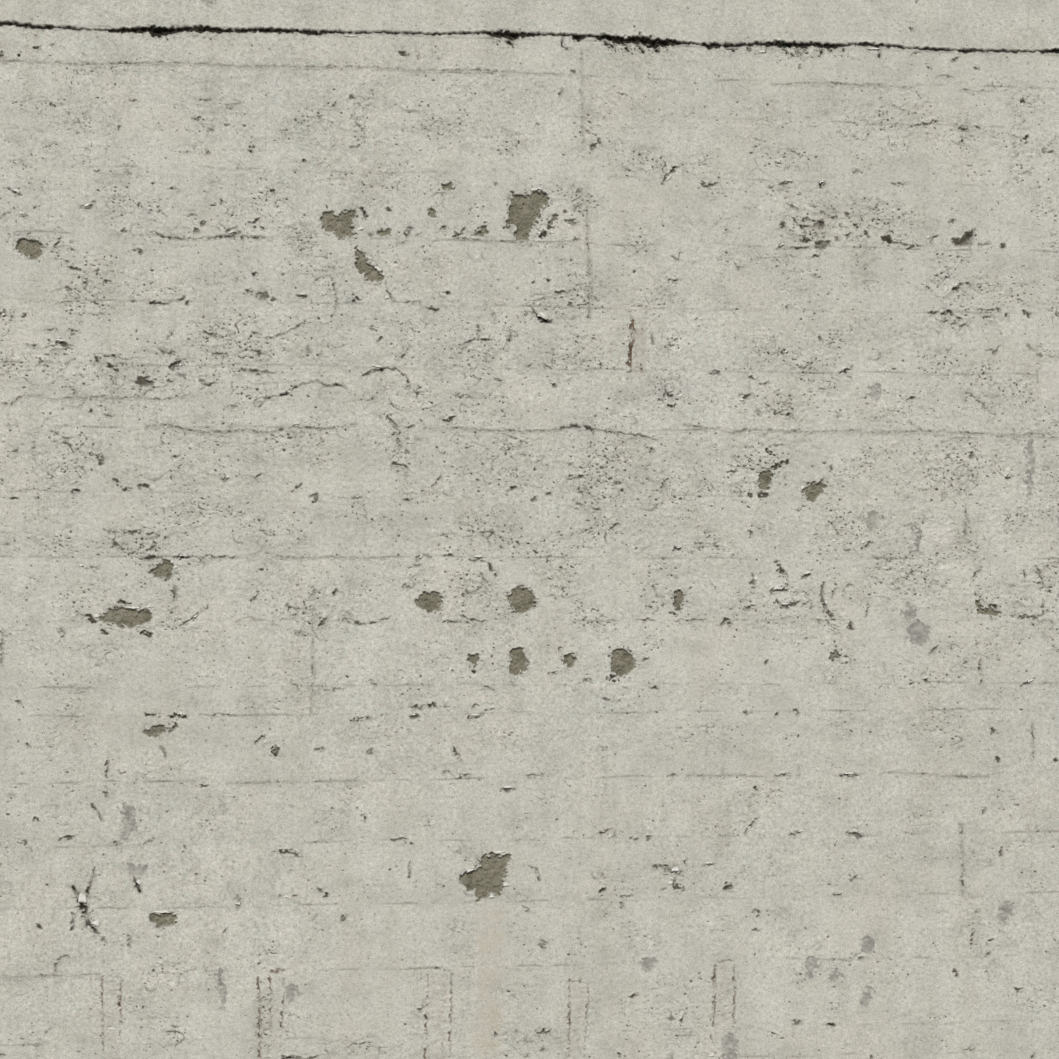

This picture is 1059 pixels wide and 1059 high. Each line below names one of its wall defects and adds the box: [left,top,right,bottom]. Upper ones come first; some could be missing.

crack [0,21,1059,143]
spalling [503,188,579,242]
spalling [15,238,42,260]
spalling [319,207,419,282]
spalling [747,445,789,498]
spalling [103,528,190,602]
spalling [84,600,152,638]
spalling [402,583,488,624]
spalling [508,585,538,614]
spalling [508,647,529,676]
spalling [606,649,649,683]
spalling [459,851,511,902]